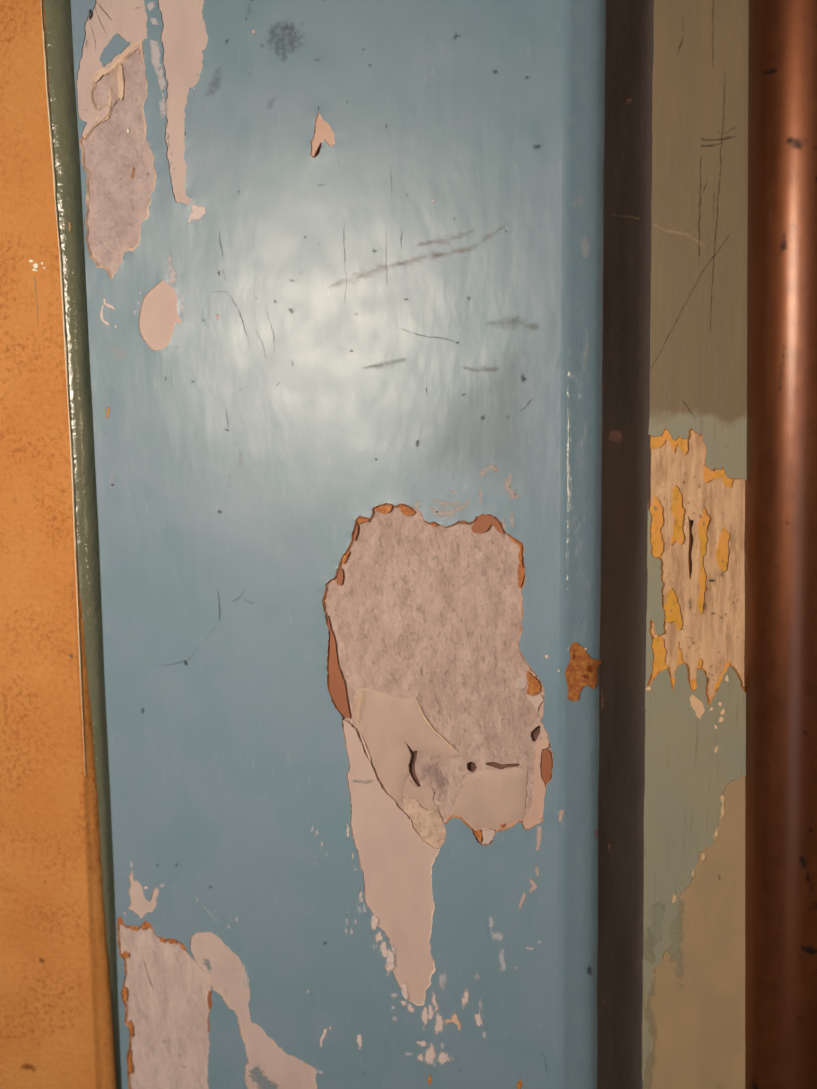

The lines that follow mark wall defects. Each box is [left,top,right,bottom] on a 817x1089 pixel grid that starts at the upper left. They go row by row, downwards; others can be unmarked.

peeling [76,0,208,280]
peeling [310,112,335,158]
peeling [134,256,184,350]
peeling [646,428,746,729]
peeling [117,863,323,1089]
peeling [322,503,553,1084]
peeling [642,775,746,1089]